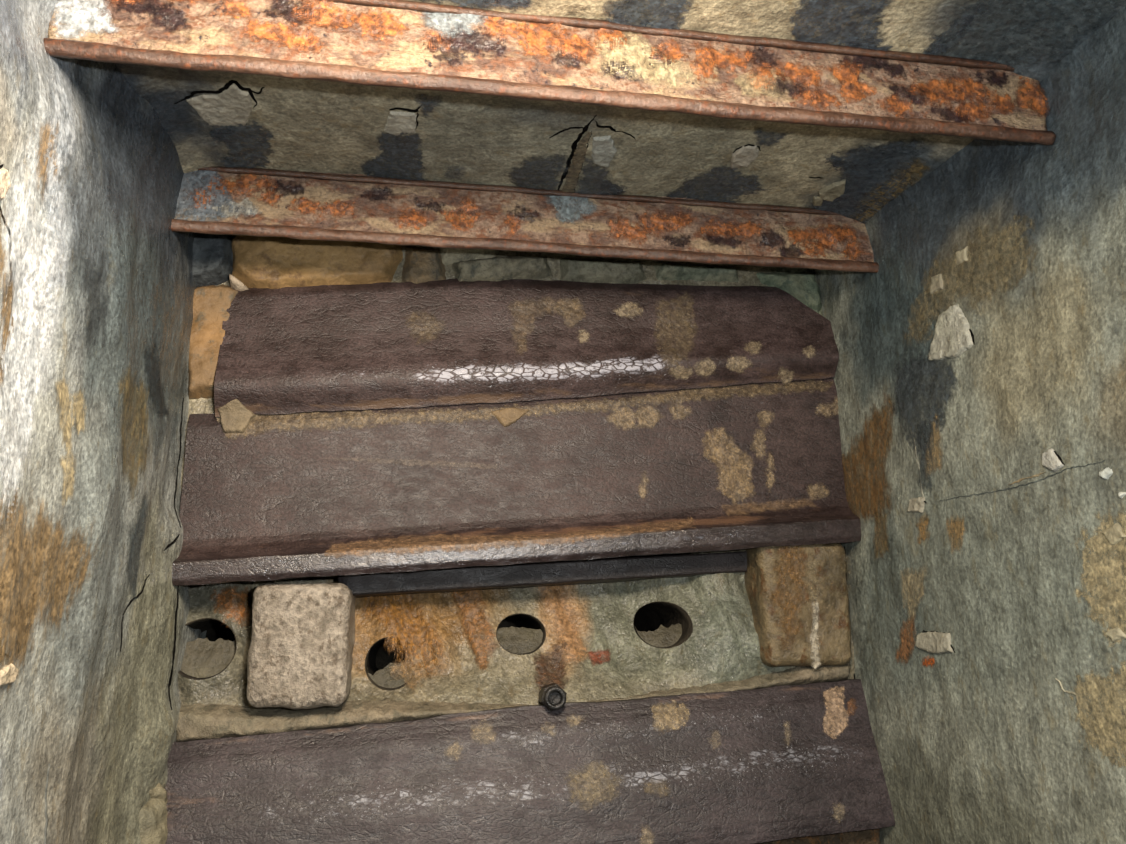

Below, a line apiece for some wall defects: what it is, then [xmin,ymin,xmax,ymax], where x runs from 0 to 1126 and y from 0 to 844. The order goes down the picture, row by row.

rust [217,0,409,52]
rust [480,16,627,63]
water stain [605,0,633,21]
crack [174,80,265,127]
rust [651,40,1047,122]
crack [549,115,636,193]
rust [192,174,354,218]
rust [608,212,762,244]
flaking render [905,217,1036,361]
rust [362,594,443,688]
rust [534,586,610,689]
spalling [915,630,955,666]